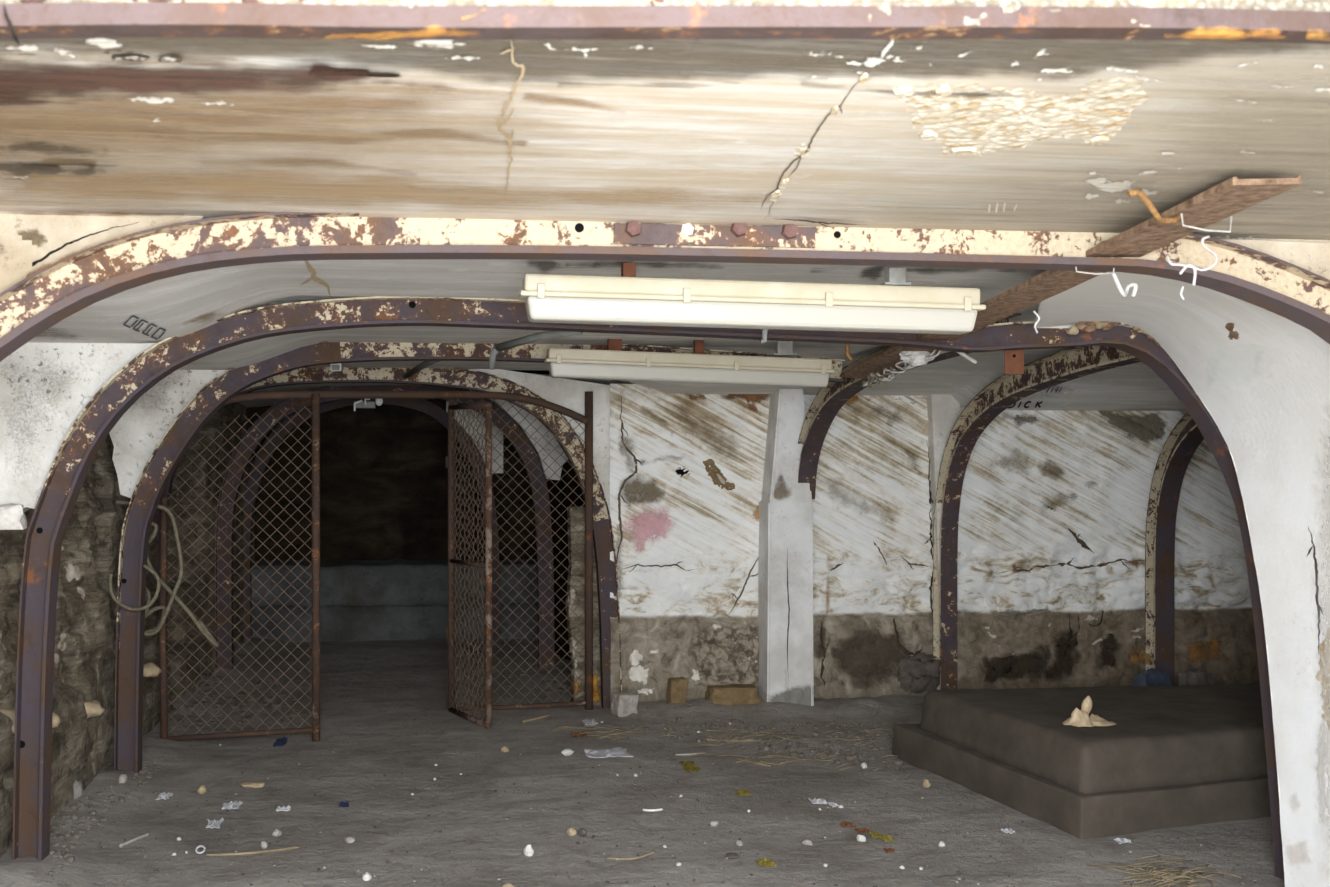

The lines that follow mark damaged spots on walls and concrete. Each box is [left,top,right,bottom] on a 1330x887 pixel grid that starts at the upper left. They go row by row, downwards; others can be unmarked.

corrosion [326,30,474,39]
peeling [414,40,480,61]
corrosion [1165,28,1285,39]
spalling [893,49,1162,157]
crack [760,80,862,228]
corrosion [1225,323,1239,340]
corrosion [724,394,770,412]
crack [616,397,695,585]
crack [1001,528,1144,573]
water stain [818,631,908,686]
water stain [984,630,1078,683]
water stain [1099,634,1120,667]